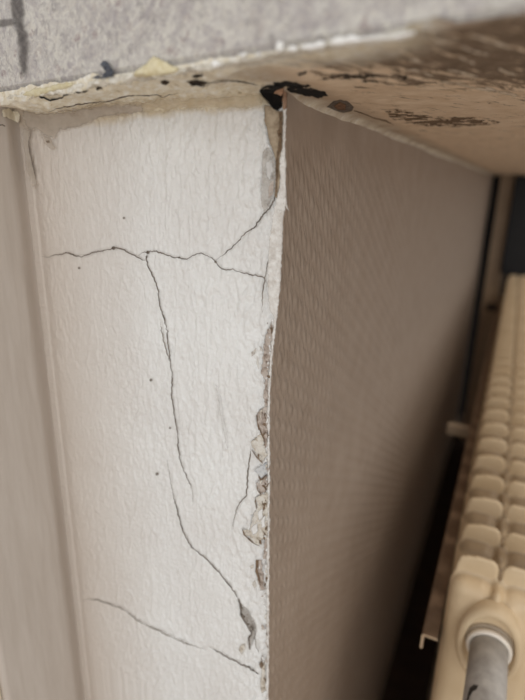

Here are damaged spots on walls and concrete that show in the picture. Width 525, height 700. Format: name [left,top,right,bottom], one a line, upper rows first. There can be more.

crack [51,186,280,605]
crack [90,599,259,674]
spalling [239,319,274,654]
spalling [259,656,268,693]